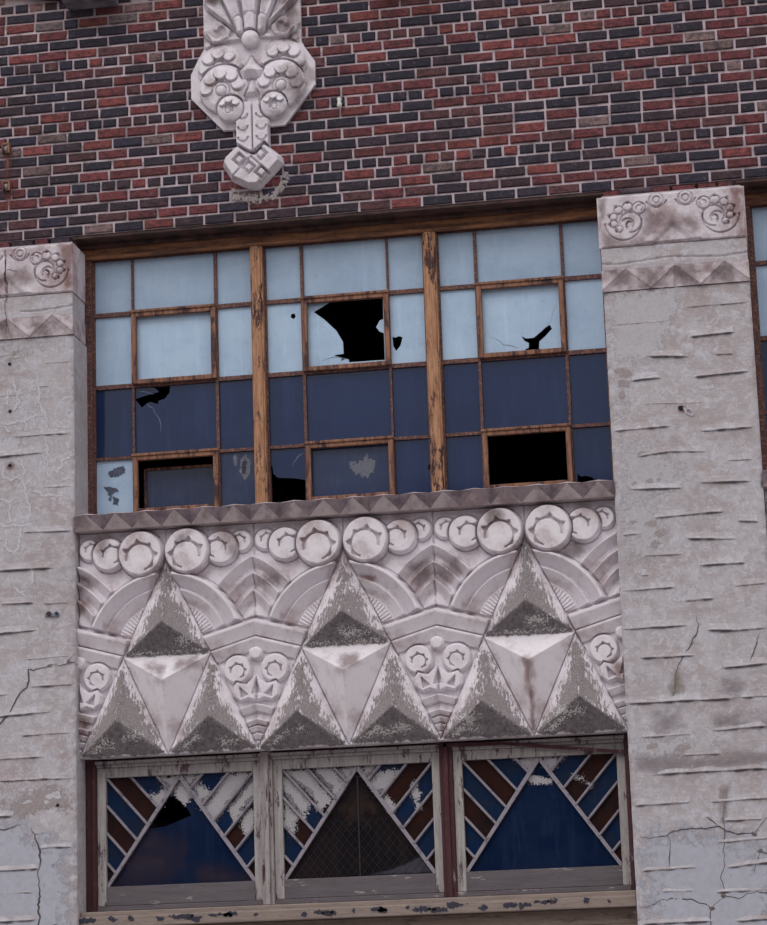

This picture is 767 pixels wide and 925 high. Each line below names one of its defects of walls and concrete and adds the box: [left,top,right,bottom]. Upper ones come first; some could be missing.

crack [4,250,18,331]
crack [0,653,78,724]
peeling [82,540,626,760]
crack [672,616,699,696]
crack [0,824,56,925]
peeling [156,911,238,922]
peeling [301,909,336,917]
peeling [405,901,468,913]
peeling [503,898,558,910]
crack [640,789,767,925]